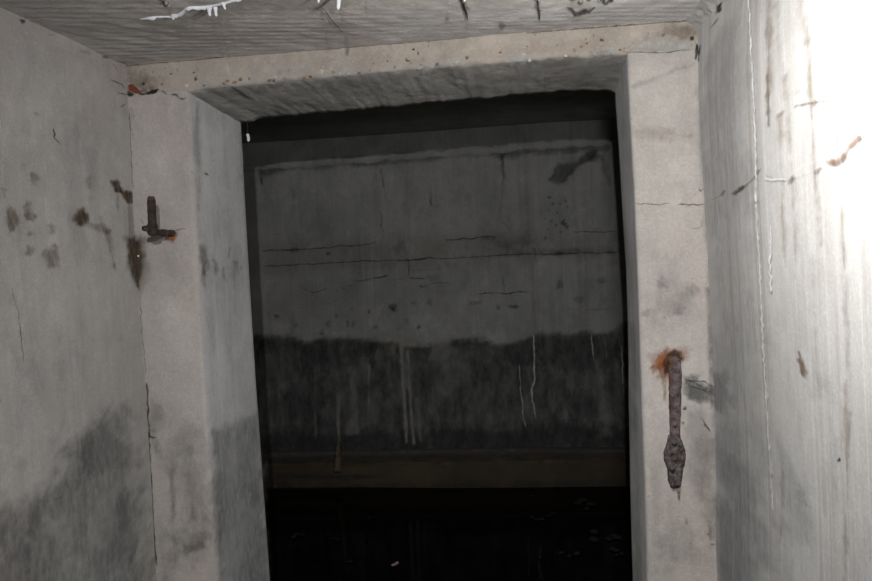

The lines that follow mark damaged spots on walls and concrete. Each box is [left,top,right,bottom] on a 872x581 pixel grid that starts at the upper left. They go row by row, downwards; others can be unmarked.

damp [140,0,241,20]
crack [460,0,471,20]
crack [535,0,638,32]
corrosion [652,350,682,377]
damp [254,325,629,463]